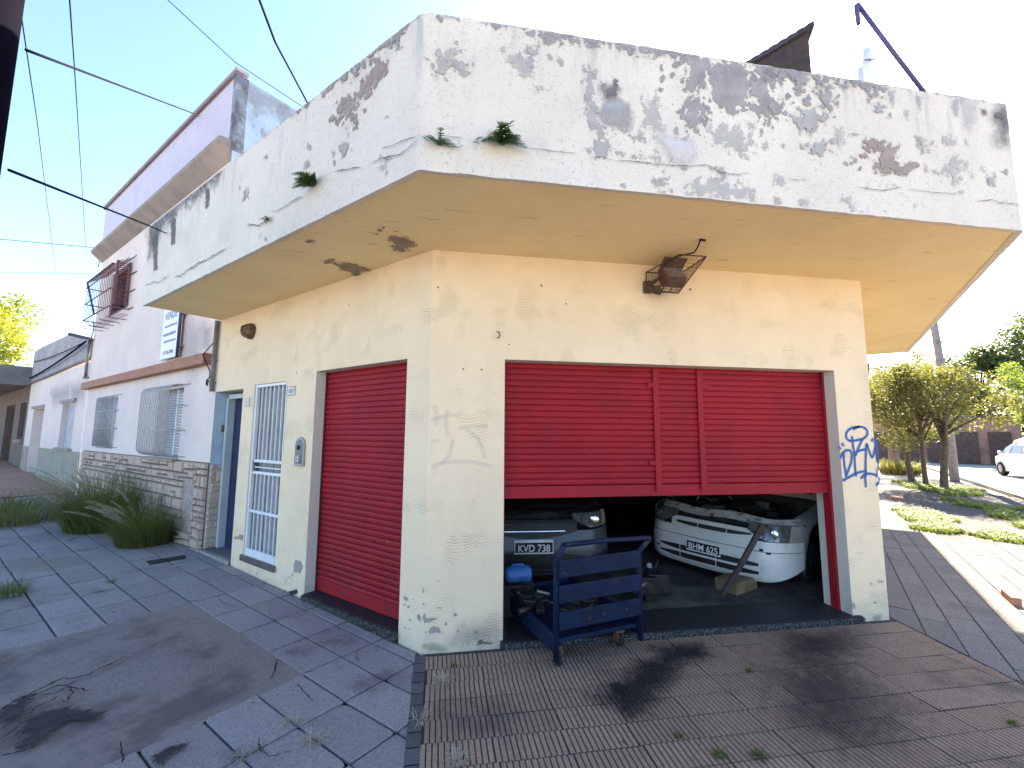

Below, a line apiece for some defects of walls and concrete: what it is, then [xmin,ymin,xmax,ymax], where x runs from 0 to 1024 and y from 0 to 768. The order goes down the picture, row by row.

peeling [424,37,474,81]
peeling [500,35,564,93]
peeling [329,32,402,165]
crack [335,135,464,172]
crack [521,147,752,175]
peeling [580,54,1009,205]
damp [148,172,219,271]
peeling [376,226,418,253]
peeling [324,259,371,276]
spalling [403,587,459,635]